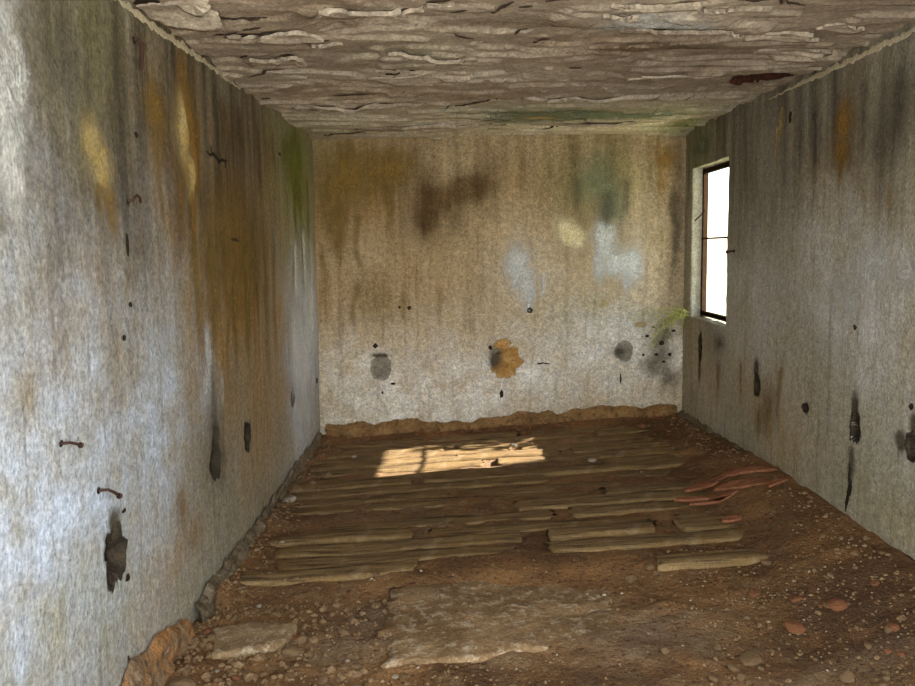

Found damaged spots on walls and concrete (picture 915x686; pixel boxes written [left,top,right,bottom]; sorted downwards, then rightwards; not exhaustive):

peeling [114,0,344,90]
crack [213,11,268,36]
peeling [313,2,455,19]
crack [426,0,473,39]
crack [491,0,560,43]
peeling [603,1,915,100]
crack [741,0,806,8]
damp [193,194,276,396]
flaking render [488,338,524,379]
crack [844,462,852,511]
flaking render [104,508,130,593]
flaking render [122,403,742,686]